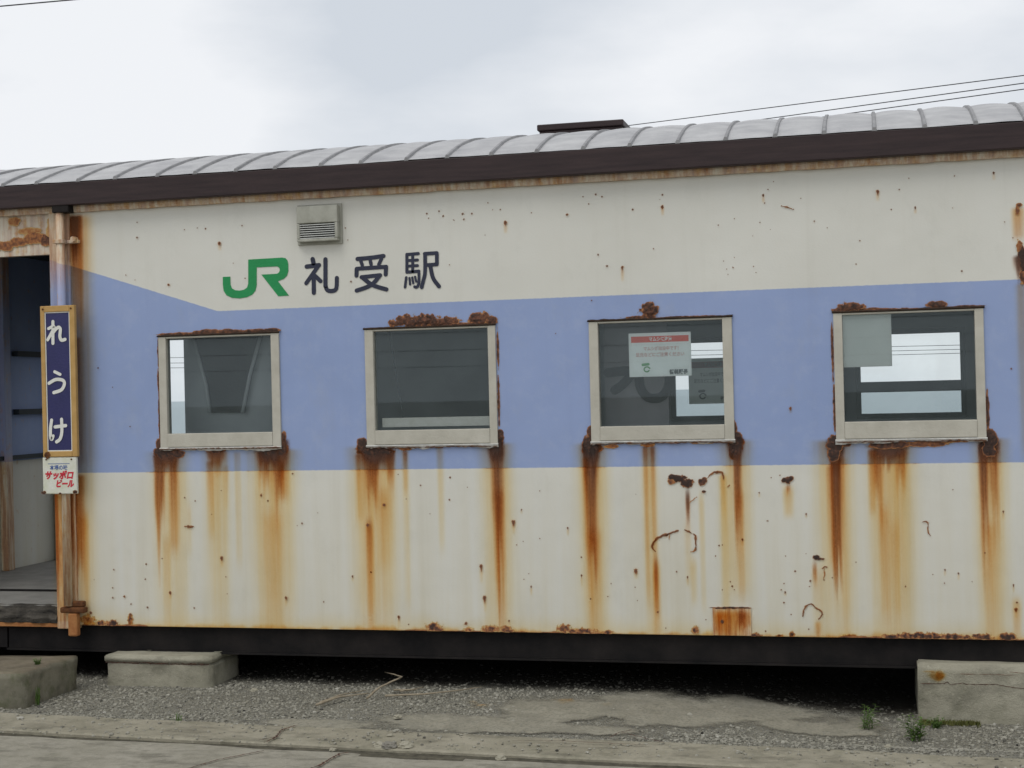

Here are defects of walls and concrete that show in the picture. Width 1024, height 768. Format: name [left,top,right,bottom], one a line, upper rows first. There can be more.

rust [0,217,49,251]
rust [388,311,504,499]
rust [825,301,999,526]
rust [259,431,288,470]
rust [356,437,412,469]
rust [582,426,619,505]
rust [728,420,745,486]